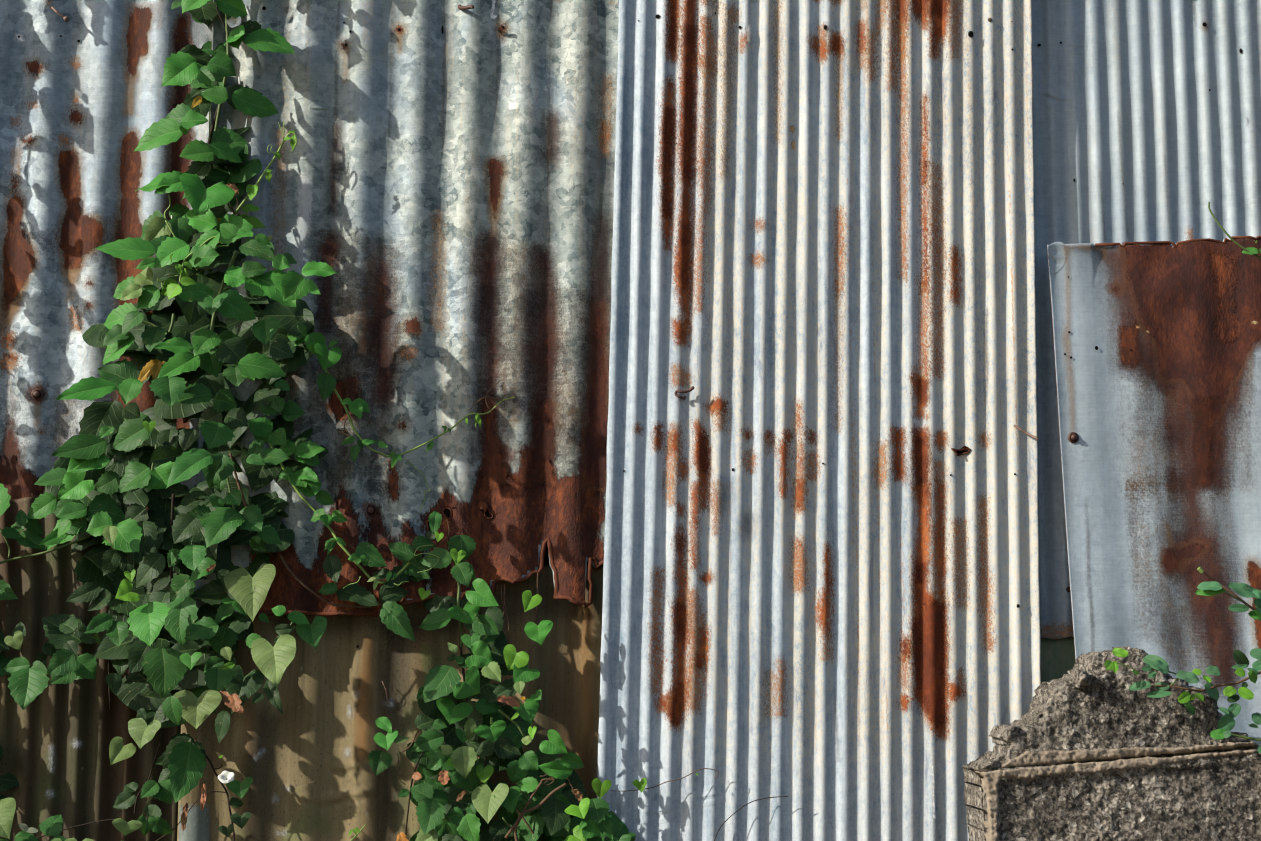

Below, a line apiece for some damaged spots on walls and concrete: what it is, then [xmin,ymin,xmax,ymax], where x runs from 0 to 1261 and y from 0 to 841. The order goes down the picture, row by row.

rust [0,117,37,375]
rust [68,302,93,332]
rust [52,93,153,316]
rust [97,380,156,419]
rust [126,6,154,113]
rust [248,158,610,794]
rust [658,0,751,349]
rust [632,393,820,732]
rust [789,536,836,661]
rust [807,0,996,740]
rust [1082,229,1261,687]